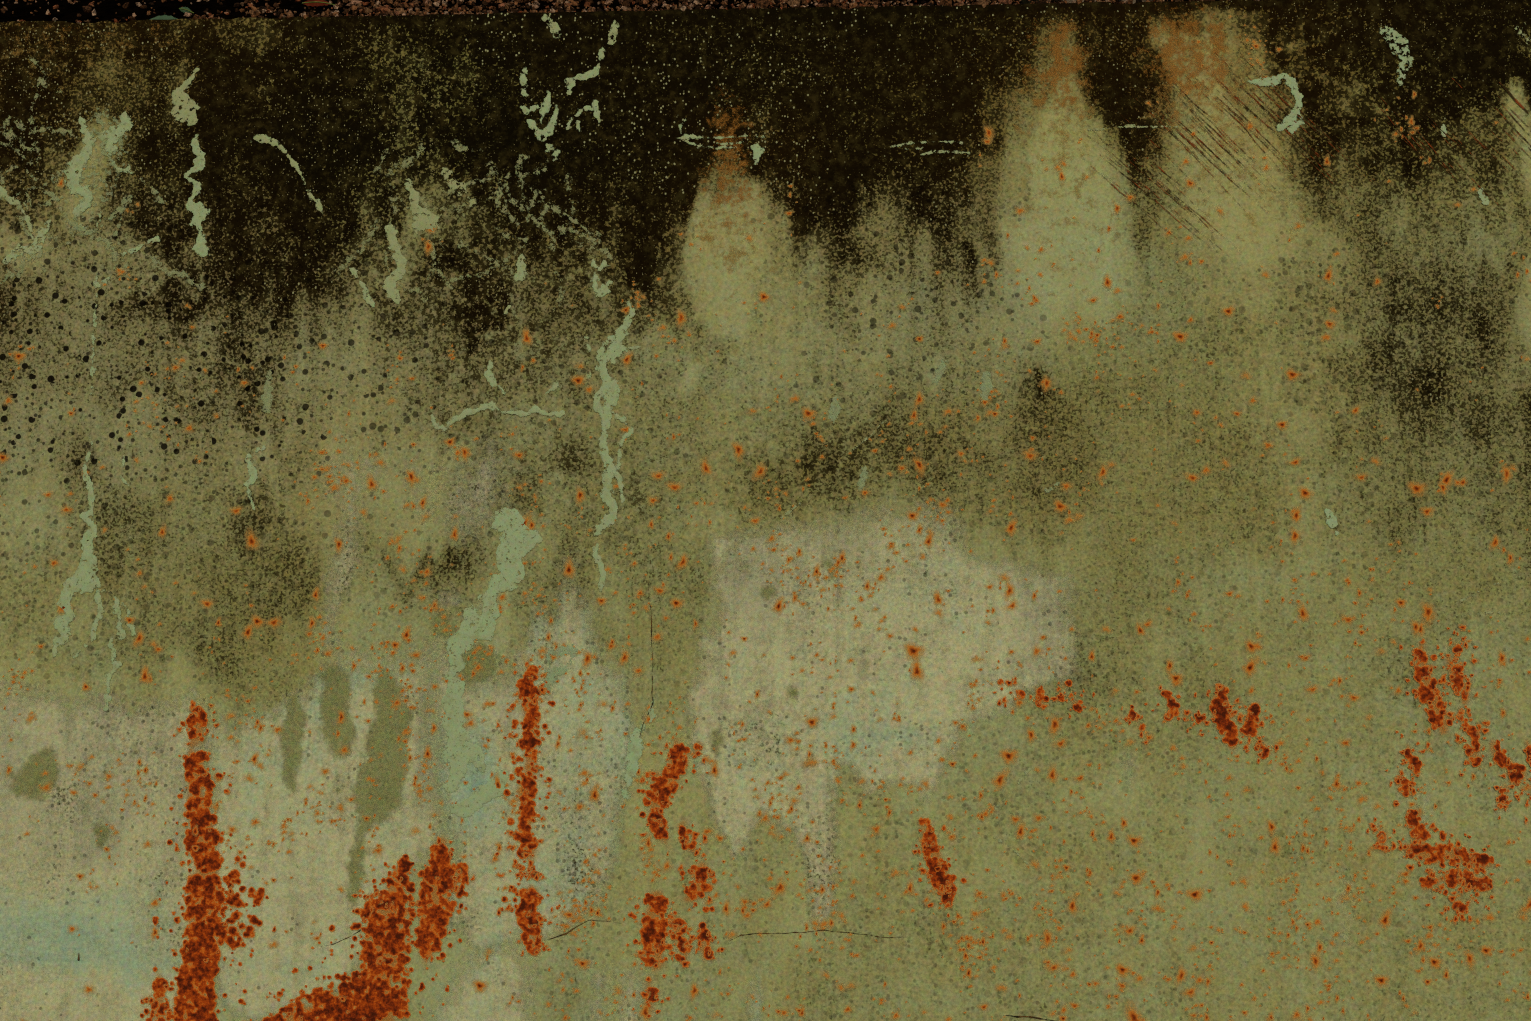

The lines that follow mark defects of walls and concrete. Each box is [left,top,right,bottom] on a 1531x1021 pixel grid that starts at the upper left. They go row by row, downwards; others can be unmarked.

peeling [0,58,210,395]
peeling [253,134,323,214]
peeling [335,143,613,307]
peeling [564,20,619,95]
rust [967,245,1074,305]
rust [1374,91,1419,142]
leakage [445,450,508,534]
peeling [431,360,565,431]
peeling [584,301,641,592]
peeling [52,441,137,711]
peeling [440,508,543,818]
rust [35,398,1531,1021]